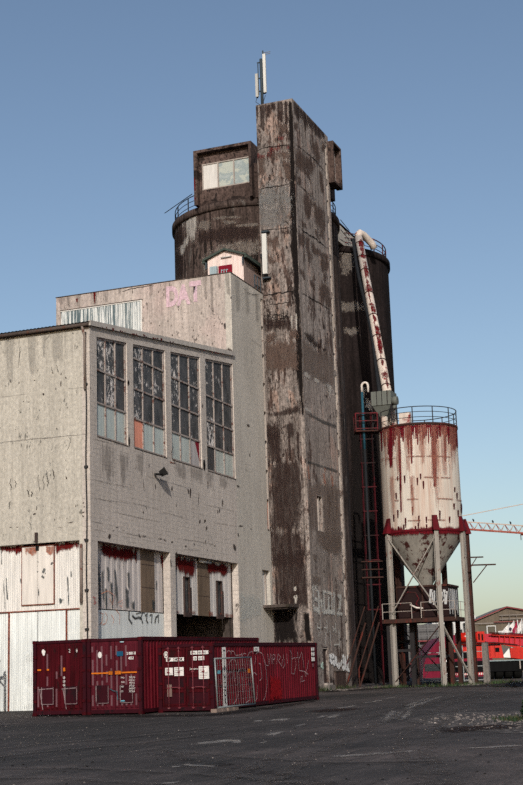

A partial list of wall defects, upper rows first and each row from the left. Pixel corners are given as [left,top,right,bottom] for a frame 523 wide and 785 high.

leakage [175,216,260,277]
rust [358,239,389,388]
leakage [256,101,341,643]
rust [380,425,462,535]
rust [0,545,36,556]
rust [46,541,79,555]
rust [101,544,137,562]
rust [175,555,196,577]
rust [207,562,232,576]
leakage [349,418,400,684]